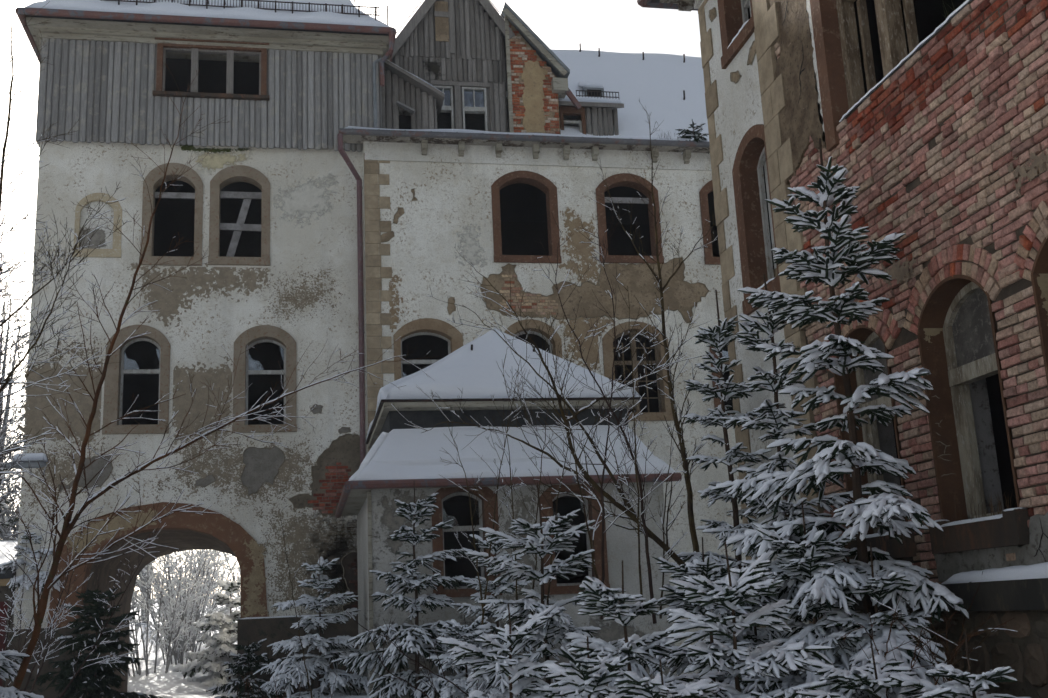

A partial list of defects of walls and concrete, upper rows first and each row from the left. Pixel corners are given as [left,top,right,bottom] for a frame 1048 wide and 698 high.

peeling [127,260,350,338]
spalling [479,203,709,372]
peeling [1037,274,1048,328]
peeling [10,323,126,531]
peeling [66,356,360,617]